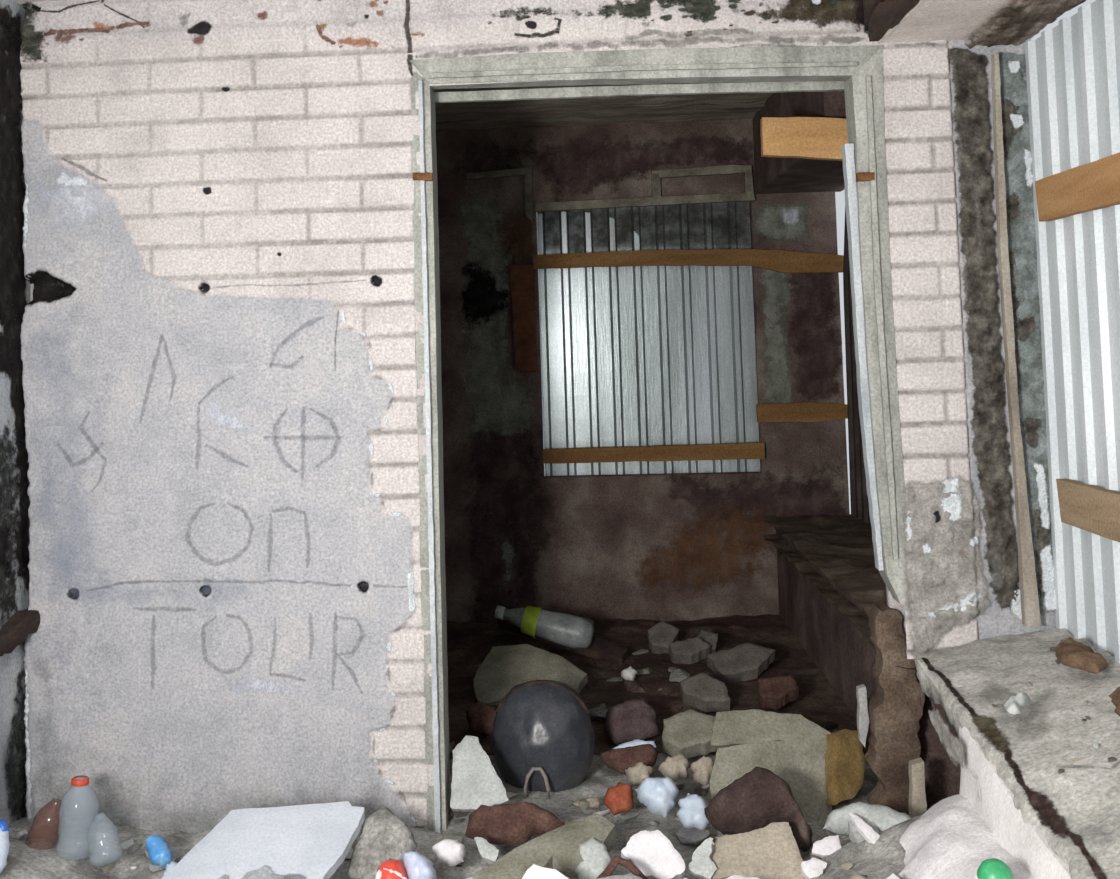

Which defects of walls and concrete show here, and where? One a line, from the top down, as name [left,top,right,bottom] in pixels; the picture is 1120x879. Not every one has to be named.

rust [38,21,149,45]
spalling [182,17,212,44]
rust [316,24,378,47]
crack [403,0,413,76]
damp [488,0,869,48]
spalling [24,271,76,304]
spalling [904,0,1086,657]
flaking render [341,303,420,517]
damp [0,527,26,579]
flaking render [374,571,428,827]
crack [921,658,1107,879]